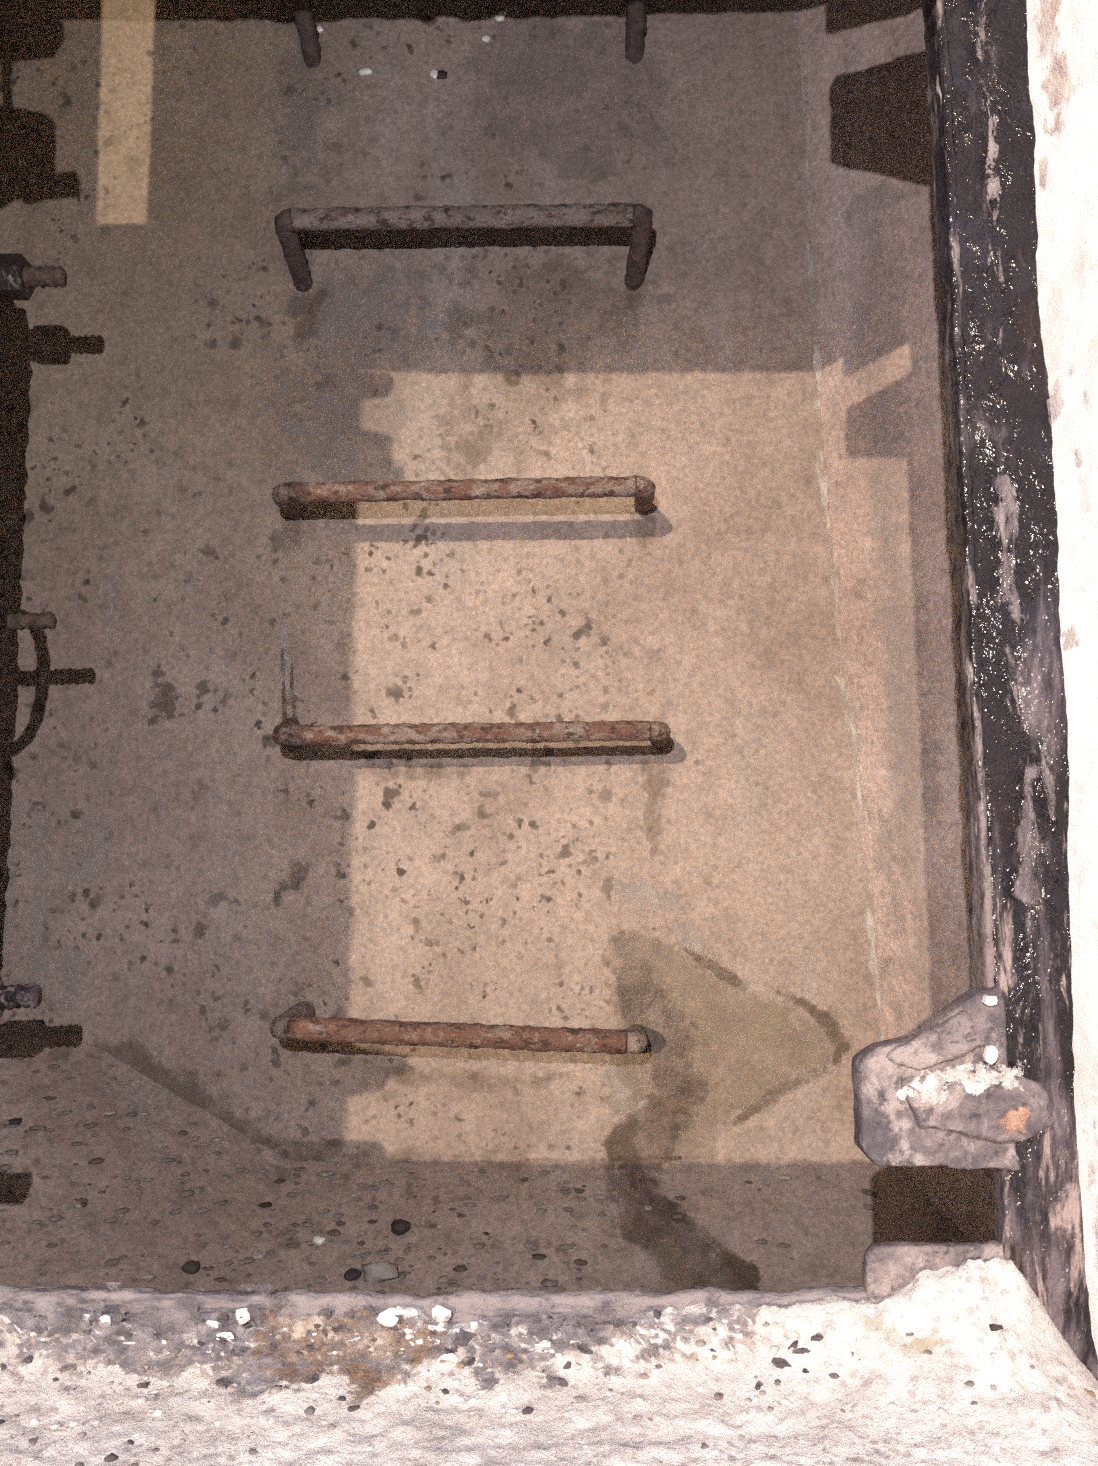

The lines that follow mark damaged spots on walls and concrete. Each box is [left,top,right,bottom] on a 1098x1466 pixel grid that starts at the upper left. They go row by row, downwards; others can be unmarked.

damp [604,880,850,1291]